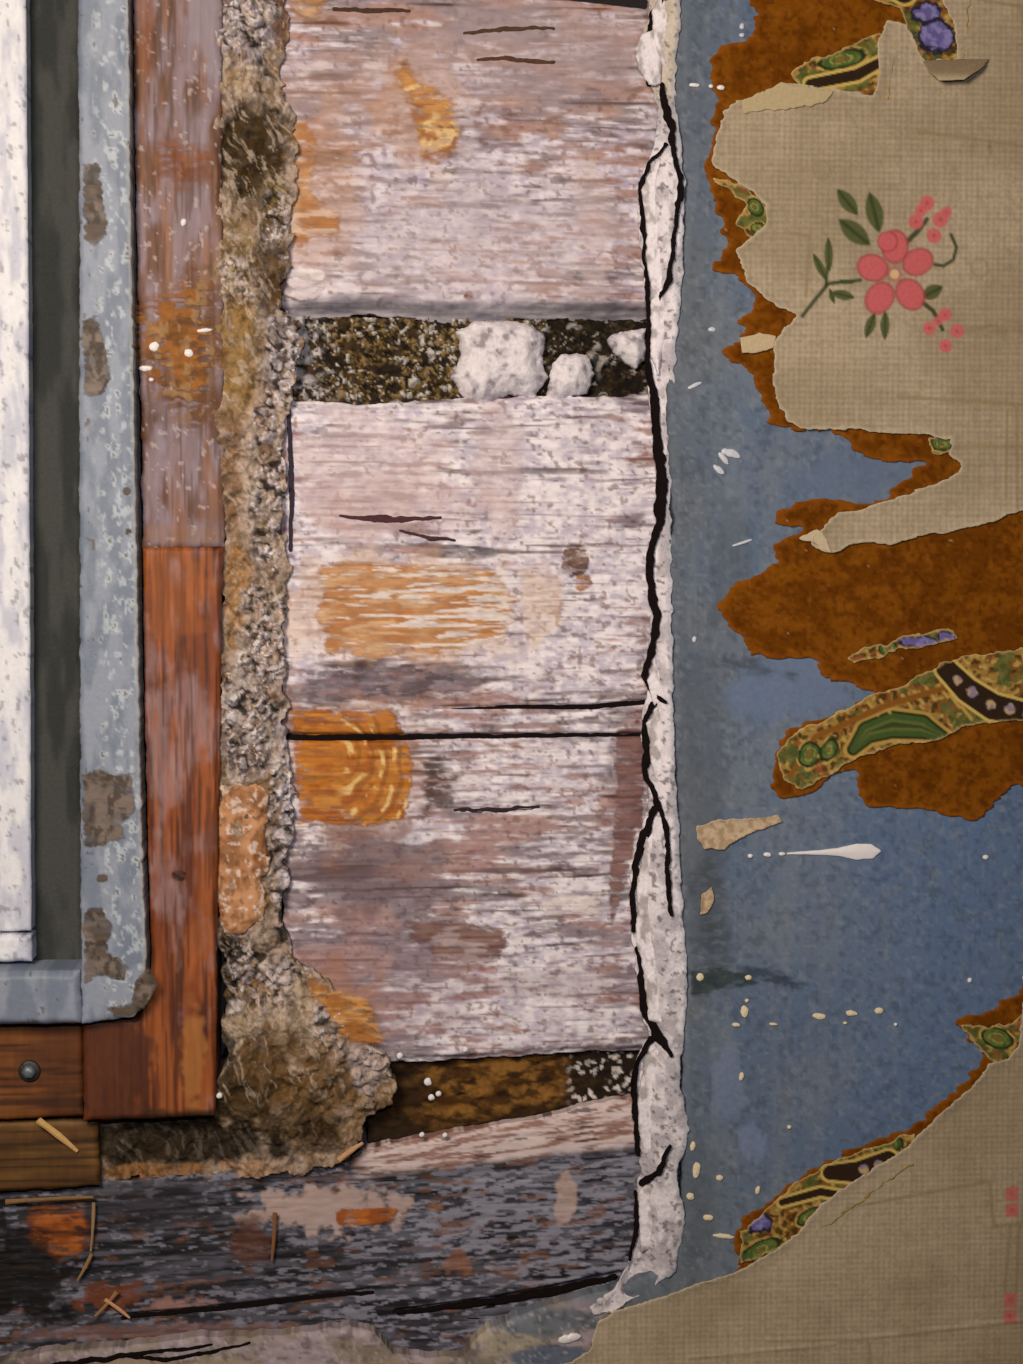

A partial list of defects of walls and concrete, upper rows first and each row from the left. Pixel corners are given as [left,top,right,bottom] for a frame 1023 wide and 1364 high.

crack [332,6,411,14]
crack [463,0,663,64]
peeling [742,83,833,114]
peeling [740,333,776,353]
peeling [799,530,831,552]
crack [52,80,684,1364]
peeling [82,771,135,847]